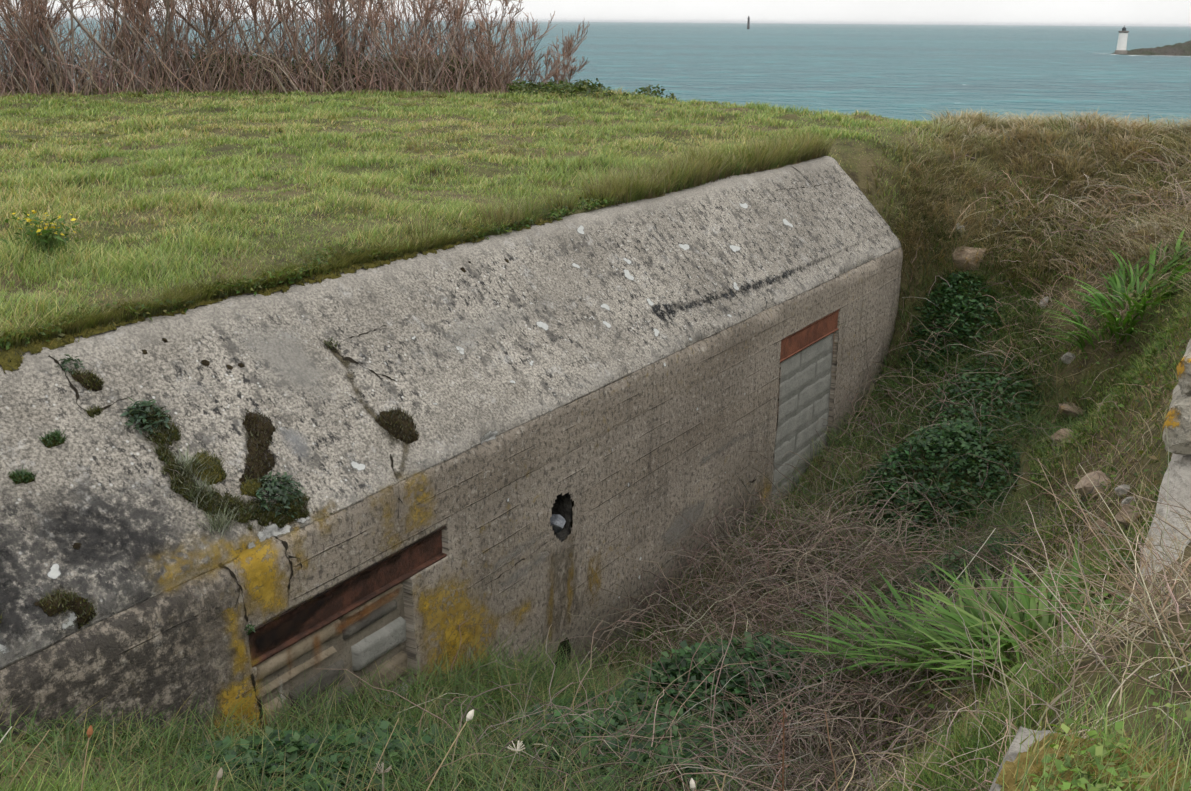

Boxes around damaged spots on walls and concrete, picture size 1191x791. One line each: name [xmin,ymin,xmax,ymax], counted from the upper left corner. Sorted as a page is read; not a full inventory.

crack [329,319,400,383]
spalling [551,492,572,542]
crack [218,563,248,622]
crack [274,536,302,604]
crack [251,673,264,730]